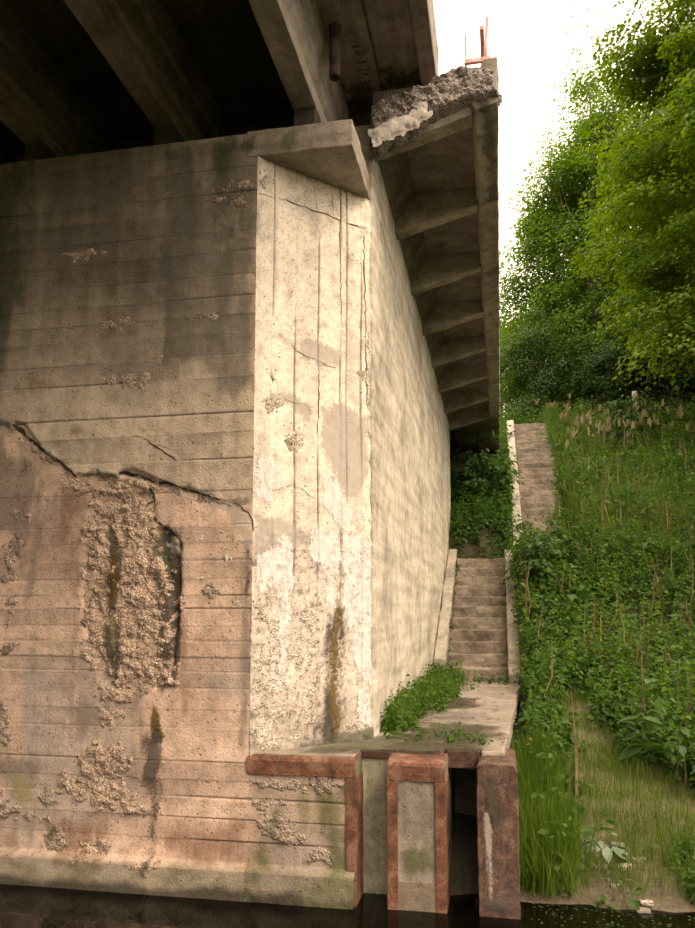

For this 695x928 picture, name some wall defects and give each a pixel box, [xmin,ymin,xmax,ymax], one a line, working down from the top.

spalling [60,248,108,263]
crack [258,186,368,405]
water stain [300,338,341,367]
spalling [0,641,21,655]
spalling [0,455,32,583]
spalling [66,475,186,731]
crack [0,412,254,545]
water stain [245,517,328,593]
water stain [281,392,369,496]
spalling [0,699,14,748]
spalling [0,740,164,866]
spalling [247,777,346,867]